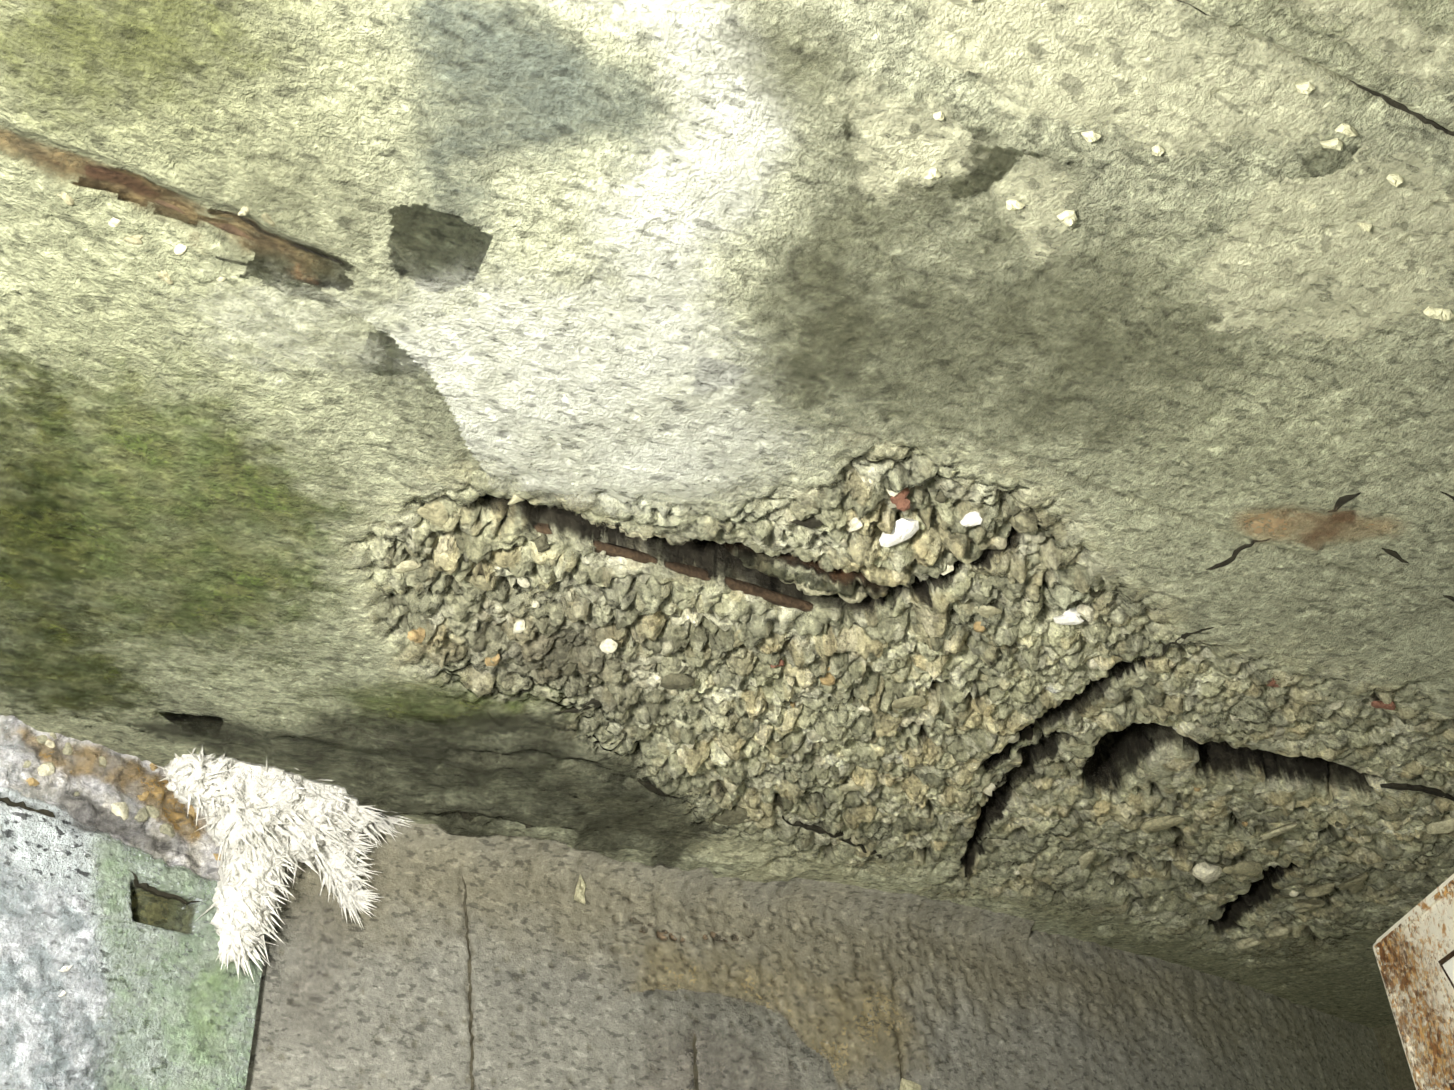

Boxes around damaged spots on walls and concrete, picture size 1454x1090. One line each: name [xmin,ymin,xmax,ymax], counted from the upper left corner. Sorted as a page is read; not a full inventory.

damp [420,0,645,158]
damp [770,38,838,95]
damp [783,169,1155,428]
crack [479,491,1040,614]
corrosion [1327,492,1361,521]
damp [143,714,713,868]
spalling [362,454,1454,962]
crack [960,627,1214,878]
corrosion [1374,878,1454,1090]